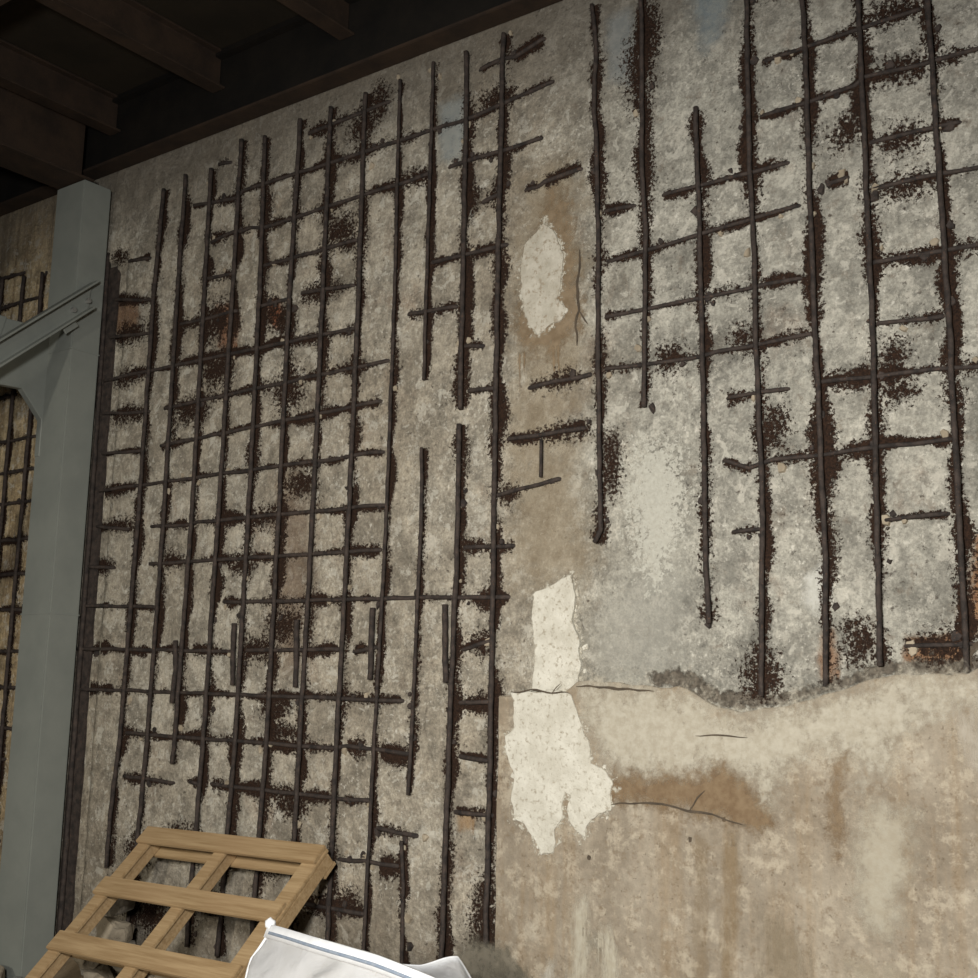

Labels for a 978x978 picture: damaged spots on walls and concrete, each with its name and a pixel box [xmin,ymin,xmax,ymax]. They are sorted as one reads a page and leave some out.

spalling [524,160,583,193]
peeling [517,215,572,338]
spalling [0,271,48,322]
rust [116,304,139,332]
rust [283,464,322,502]
rust [970,535,978,621]
crack [513,683,652,694]
crack [701,732,747,740]
crack [611,791,743,825]
damp [611,761,774,830]
spalling [218,867,293,899]
rust [119,902,167,940]